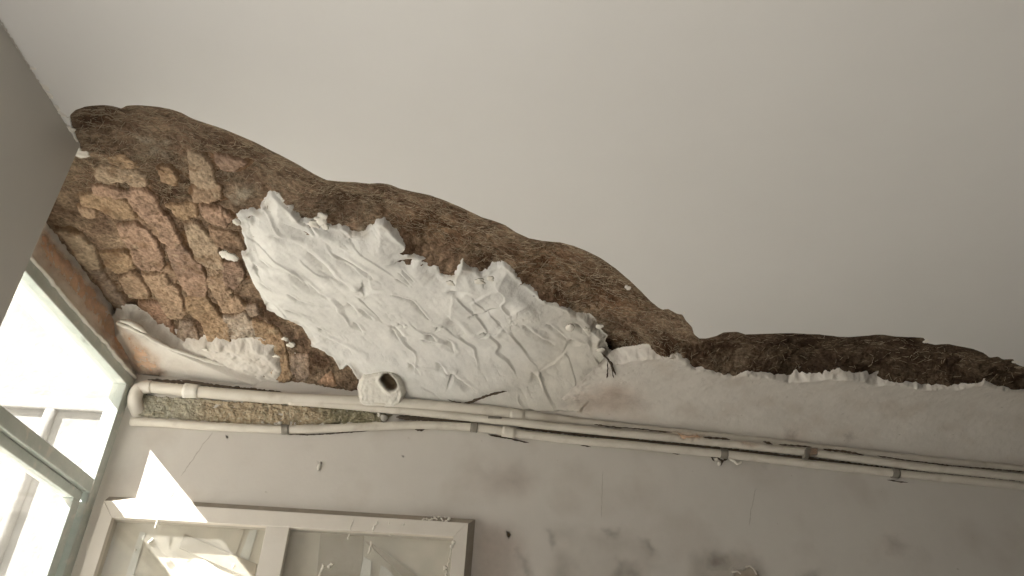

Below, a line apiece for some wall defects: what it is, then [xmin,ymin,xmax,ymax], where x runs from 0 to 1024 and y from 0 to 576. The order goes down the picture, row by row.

flaking render [54,148,337,387]